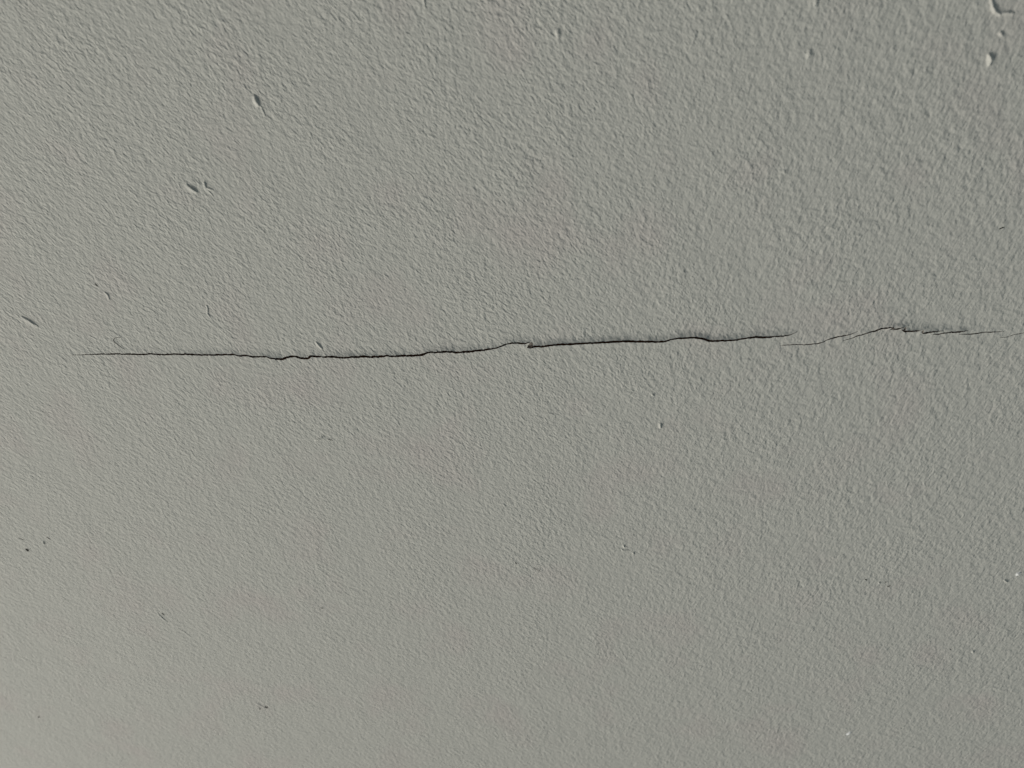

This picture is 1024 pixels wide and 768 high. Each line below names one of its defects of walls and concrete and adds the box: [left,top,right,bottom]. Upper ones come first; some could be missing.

crack [68,322,1024,364]